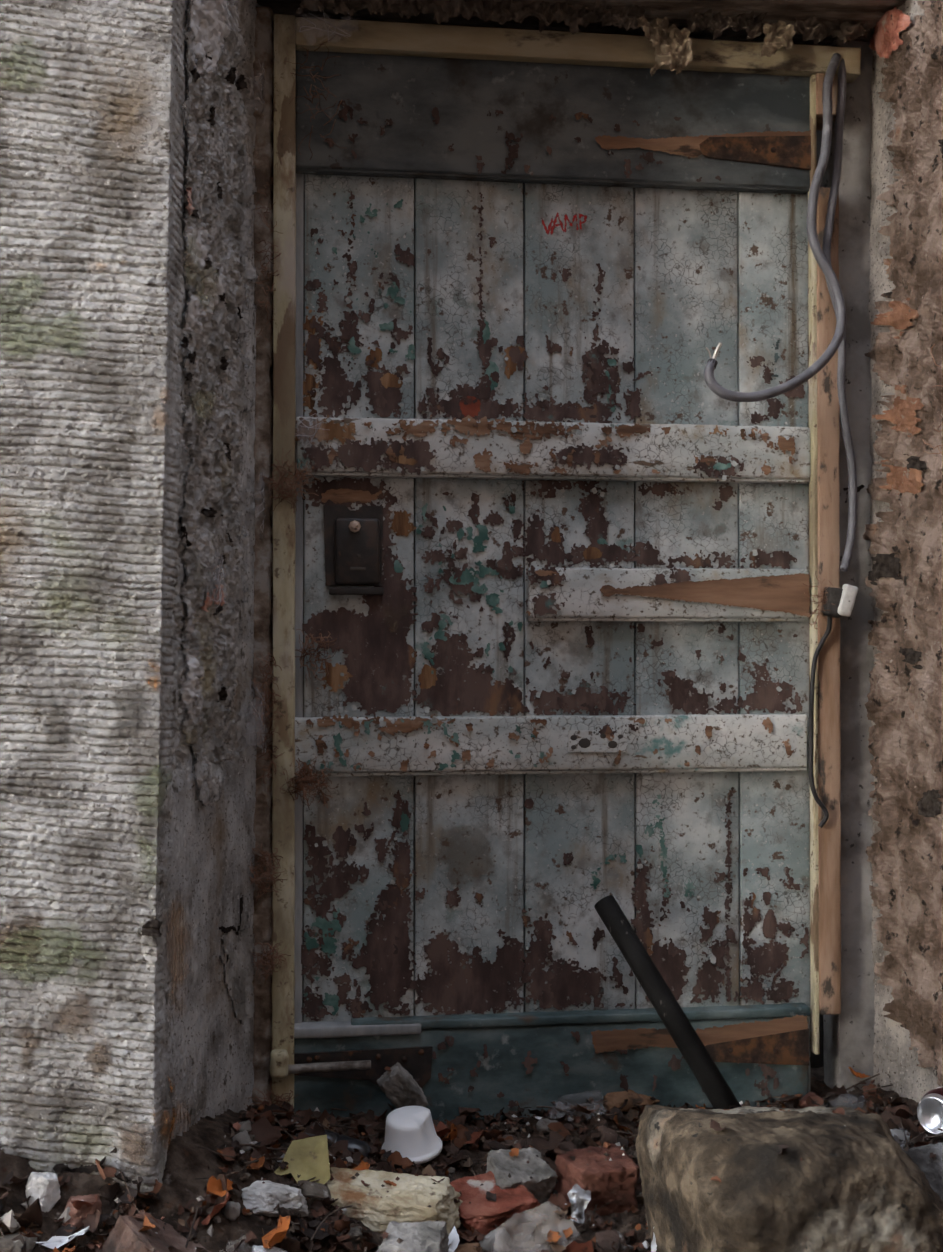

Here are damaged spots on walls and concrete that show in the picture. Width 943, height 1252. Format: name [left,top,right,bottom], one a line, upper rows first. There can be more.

peeling [295,192,811,771]
crack [219,895,243,935]
peeling [301,790,650,1022]
peeling [590,787,809,1046]
spalling [377,1062,428,1108]
peeling [571,1028,684,1071]